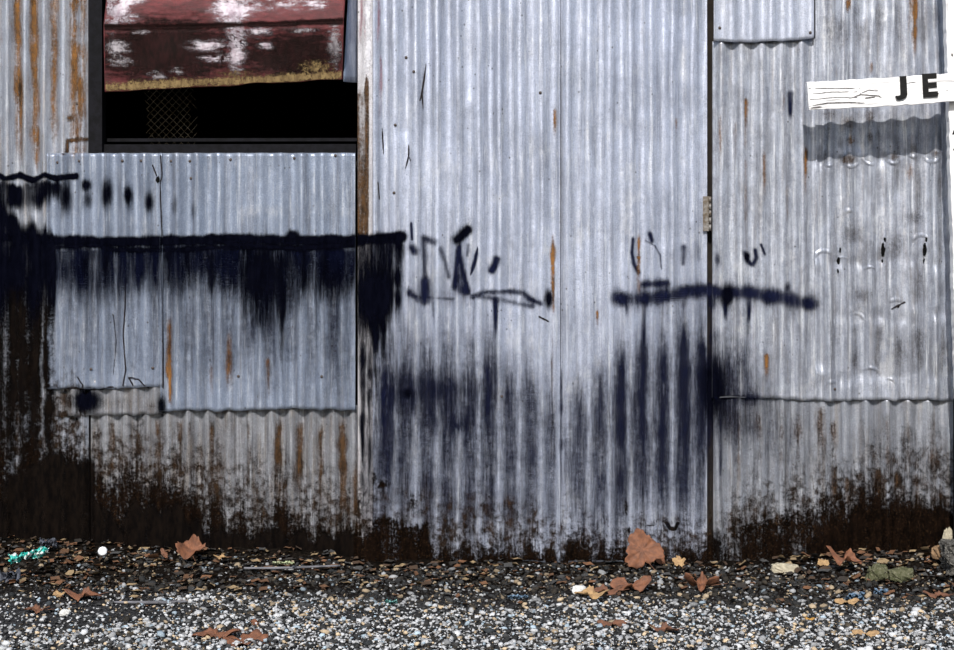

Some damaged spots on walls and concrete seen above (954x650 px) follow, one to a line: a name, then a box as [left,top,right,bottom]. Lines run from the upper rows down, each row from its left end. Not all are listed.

rust [14,0,40,164]
rust [61,0,88,155]
peeling [109,41,129,64]
peeling [106,0,141,23]
rust [104,14,343,91]
peeling [196,0,271,68]
peeling [329,25,340,62]
rust [0,381,953,565]